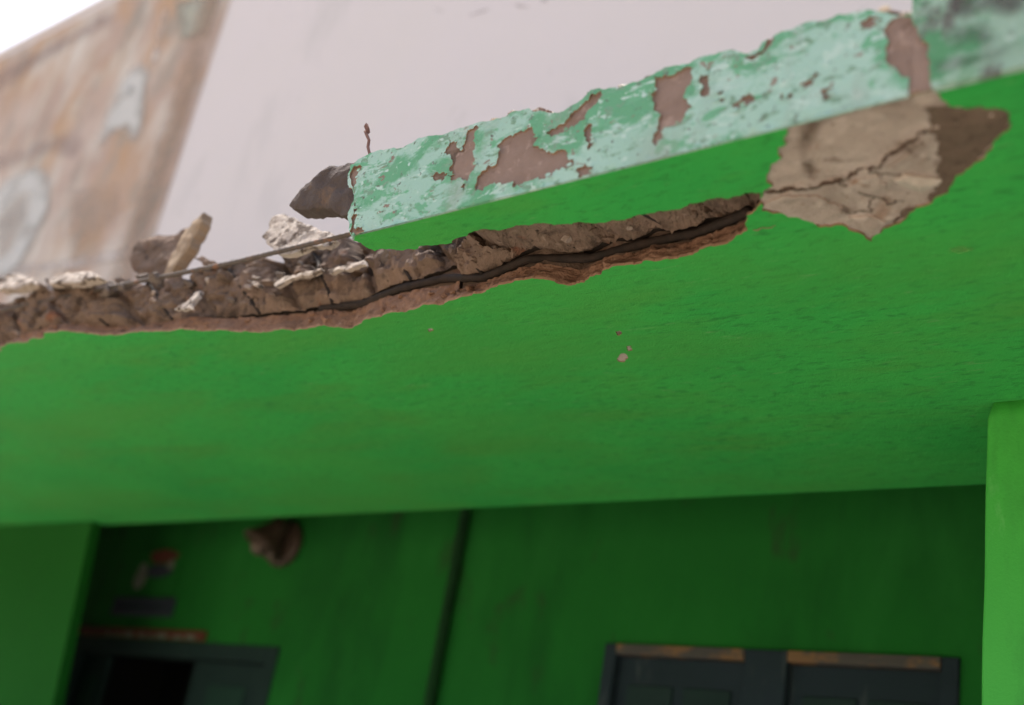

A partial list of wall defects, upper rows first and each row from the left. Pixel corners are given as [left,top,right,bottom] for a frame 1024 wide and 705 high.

spalling [0,16,1011,351]